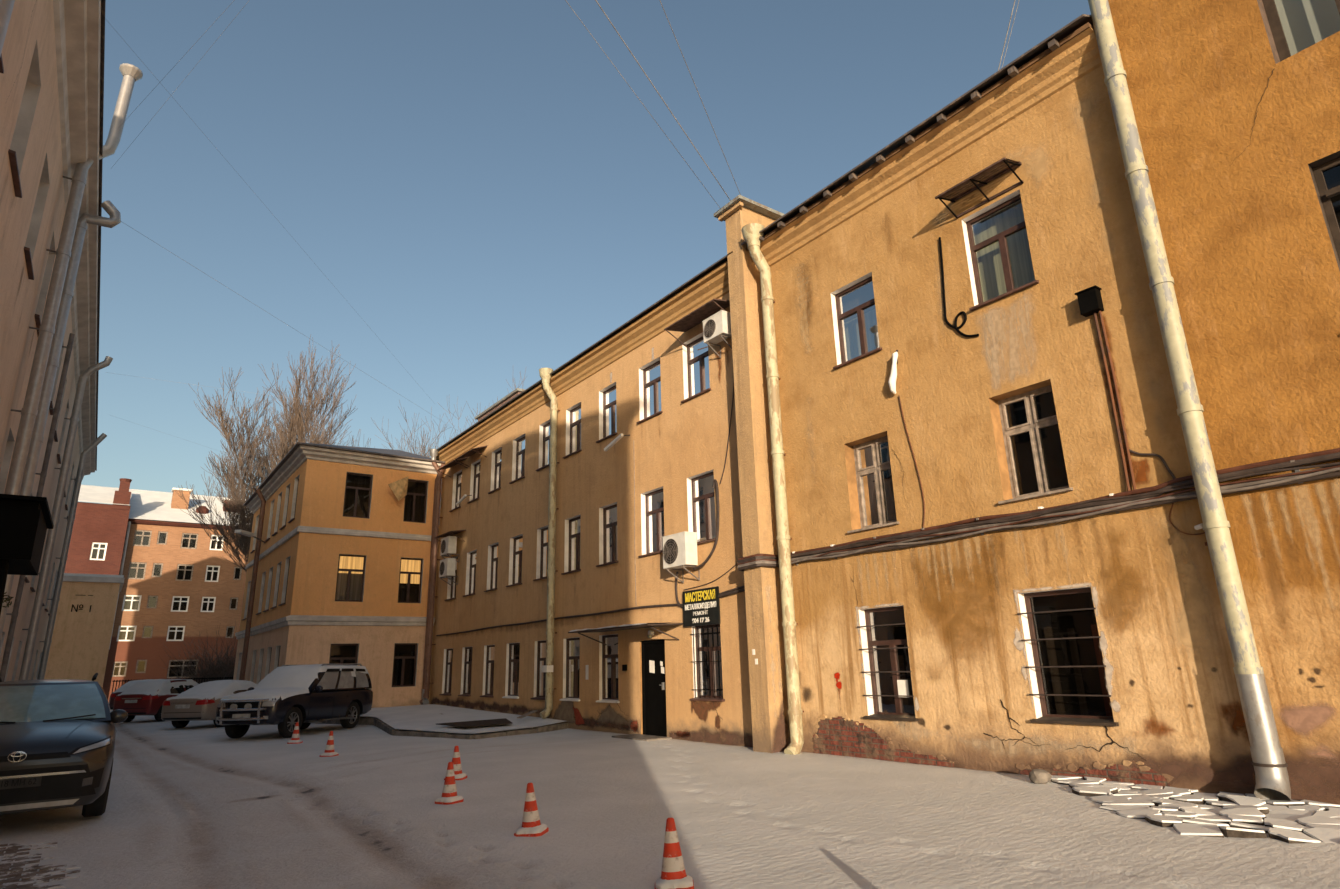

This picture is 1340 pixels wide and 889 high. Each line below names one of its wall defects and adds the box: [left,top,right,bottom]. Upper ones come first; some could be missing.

crack [1234,68,1275,160]
corrosion [1098,317,1149,484]
peeling [856,603,899,645]
damp [921,543,998,650]
peeling [1014,583,1098,705]
peeling [1100,631,1120,712]
damp [1105,542,1141,629]
flaking render [812,698,954,768]
crack [983,699,1147,761]
spalling [1281,705,1334,734]